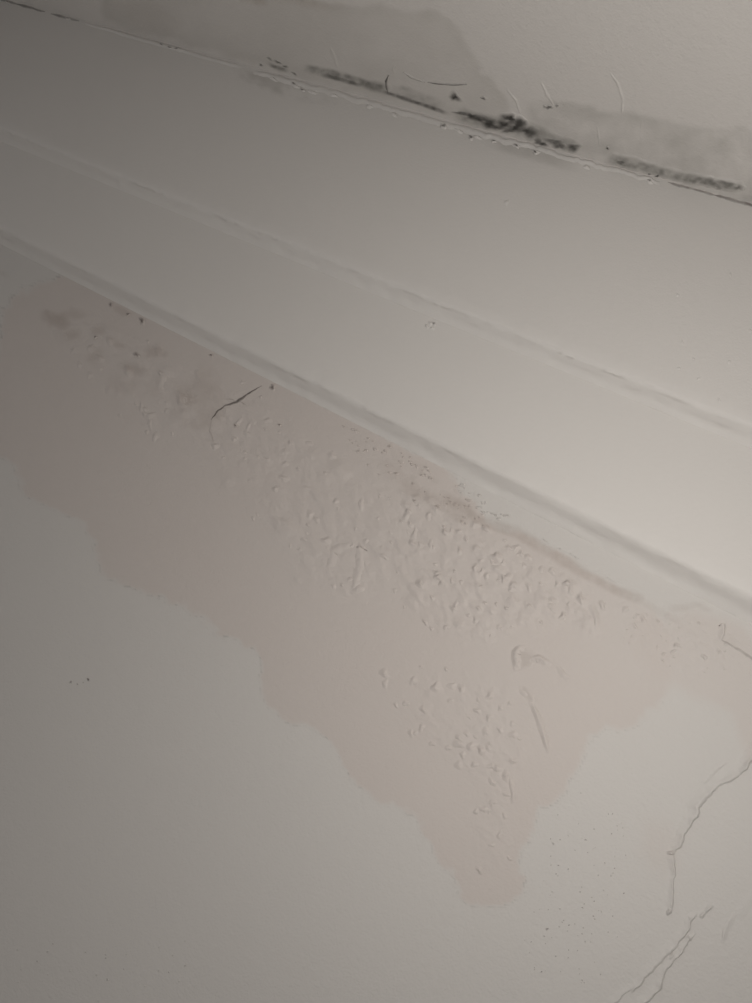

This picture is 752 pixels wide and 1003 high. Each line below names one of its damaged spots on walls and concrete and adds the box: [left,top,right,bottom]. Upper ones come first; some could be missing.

leakage [96,0,752,203]
leakage [37,302,238,433]
leakage [342,425,752,775]
crack [717,623,752,660]
crack [603,729,752,1003]